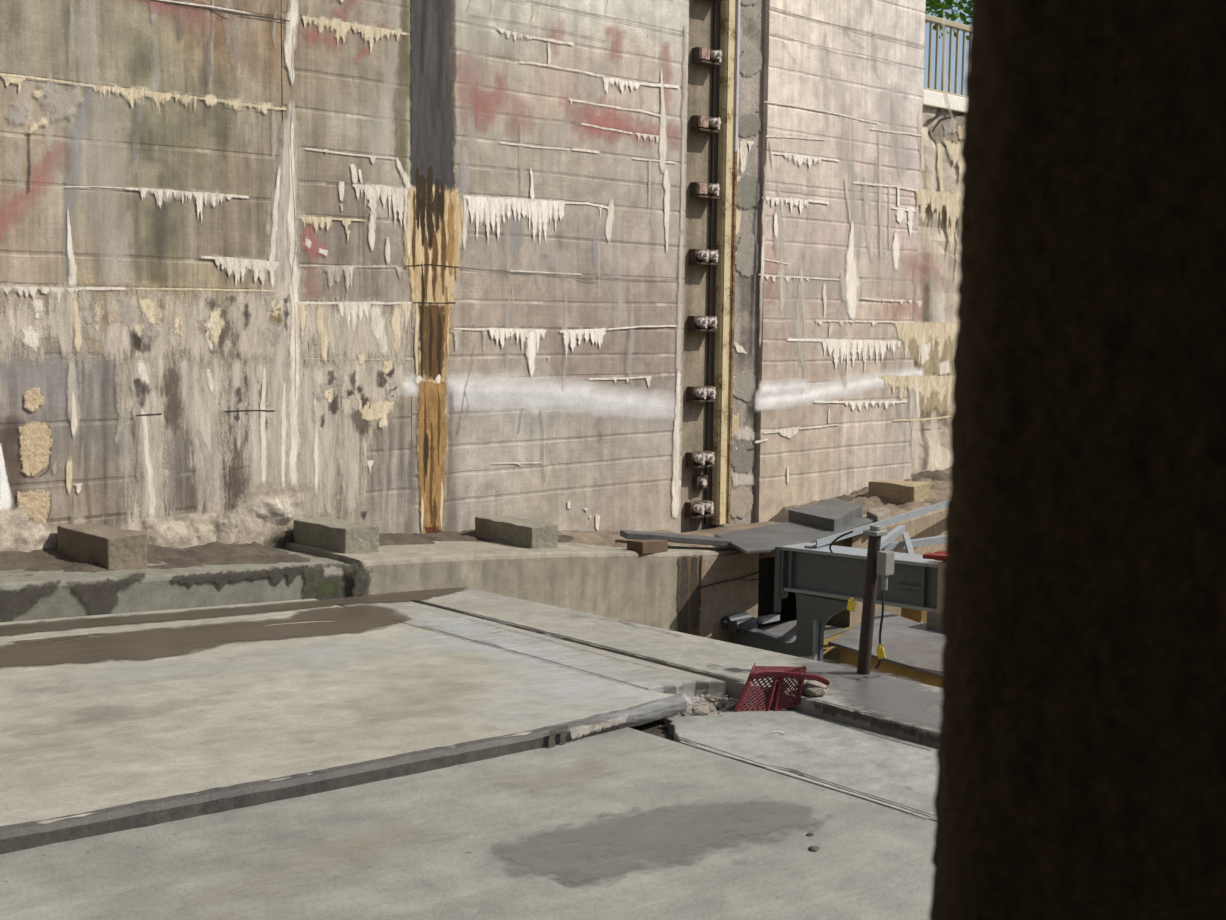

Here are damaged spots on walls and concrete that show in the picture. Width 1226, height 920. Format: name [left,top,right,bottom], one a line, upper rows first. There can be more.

peeling [17,388,57,526]
damp [0,562,465,667]
damp [0,0,614,539]
peeling [313,354,400,429]
corrosion [403,165,469,534]
damp [449,28,688,518]
damp [737,101,964,470]
damp [494,800,822,885]